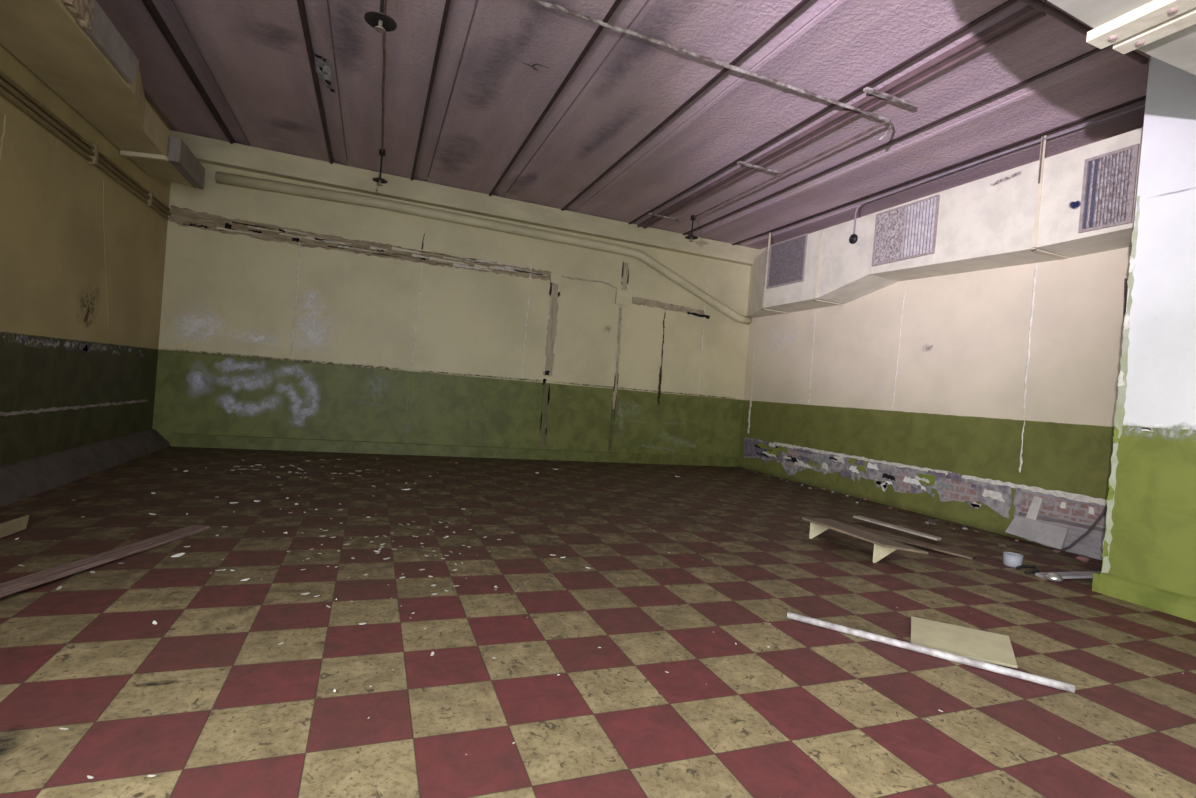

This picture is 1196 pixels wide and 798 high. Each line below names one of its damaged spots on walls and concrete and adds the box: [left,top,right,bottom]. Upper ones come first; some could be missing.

water stain [223,361,317,424]
peeling [169,205,560,449]
spalling [744,196,1195,573]